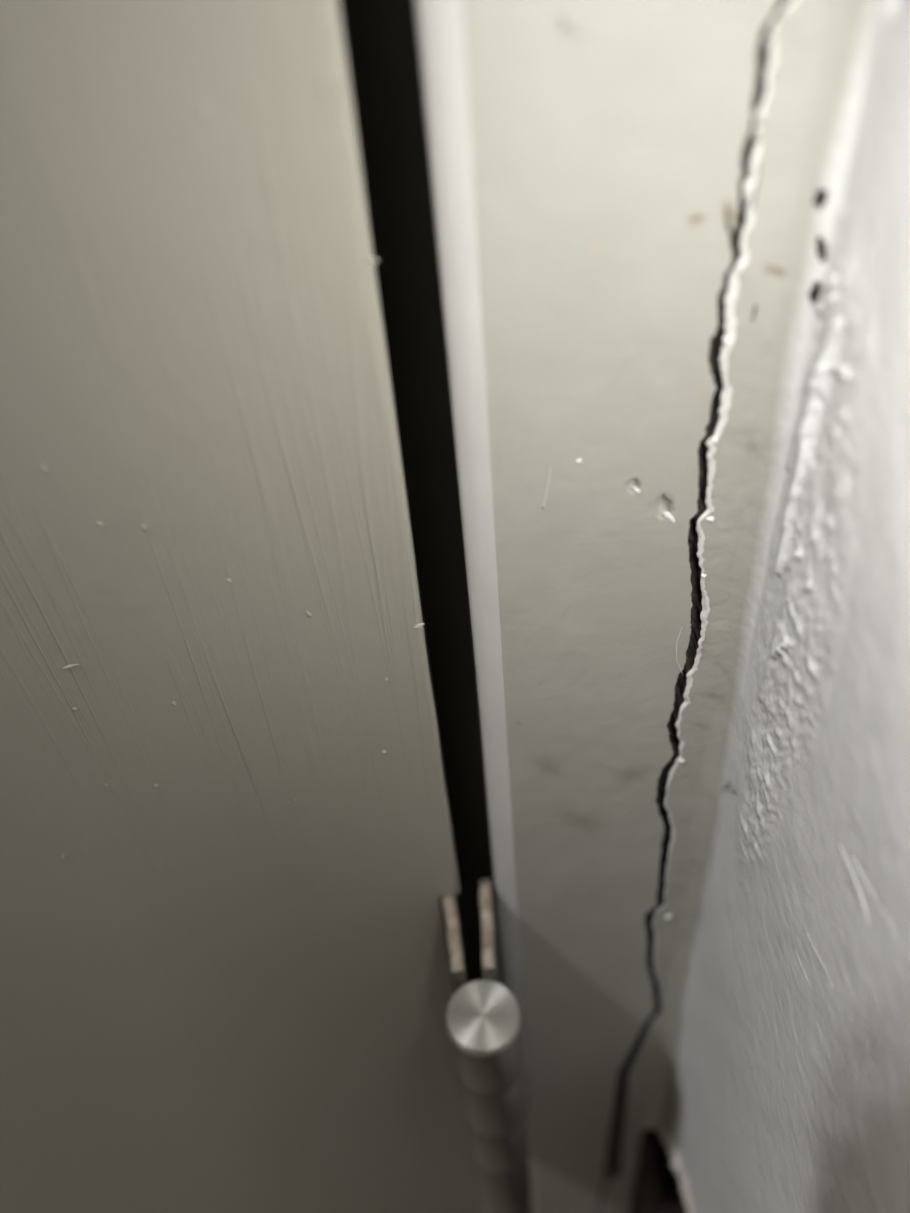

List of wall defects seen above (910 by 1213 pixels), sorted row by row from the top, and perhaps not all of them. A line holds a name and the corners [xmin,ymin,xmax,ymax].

spalling [640,1123,694,1213]
crack [598,0,797,1213]